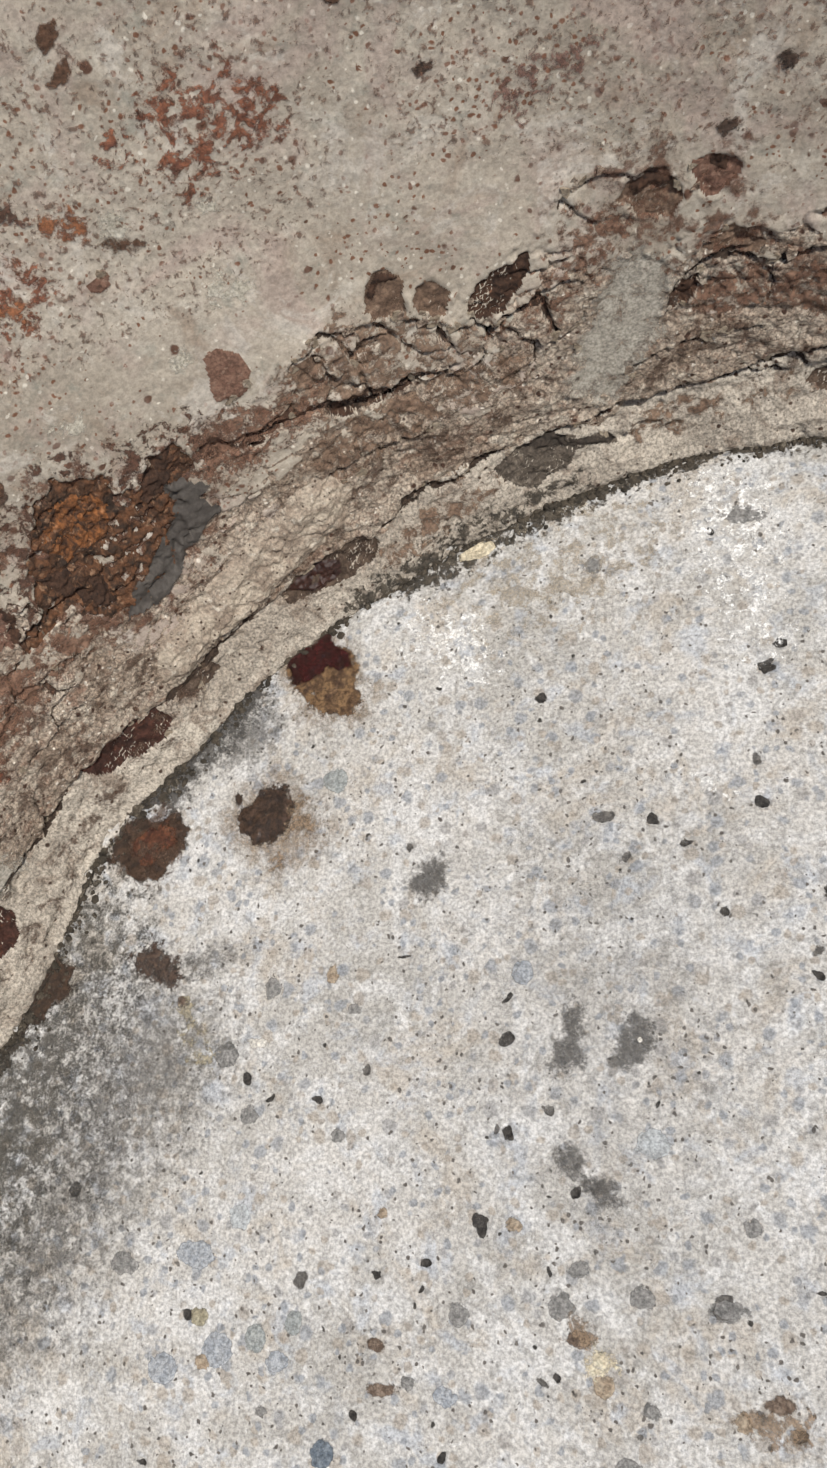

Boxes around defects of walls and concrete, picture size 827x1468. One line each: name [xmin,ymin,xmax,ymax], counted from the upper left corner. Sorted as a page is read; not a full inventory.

corrosion [0,0,342,389]
spalling [364,251,531,322]
crack [251,273,589,447]
spalling [0,404,297,655]
water stain [323,448,400,510]
crack [329,422,440,476]
spalling [494,430,618,488]
water stain [140,675,284,813]
corrosion [281,634,368,723]
crack [0,436,827,1077]
corrosion [106,802,191,891]
water stain [0,643,239,1362]